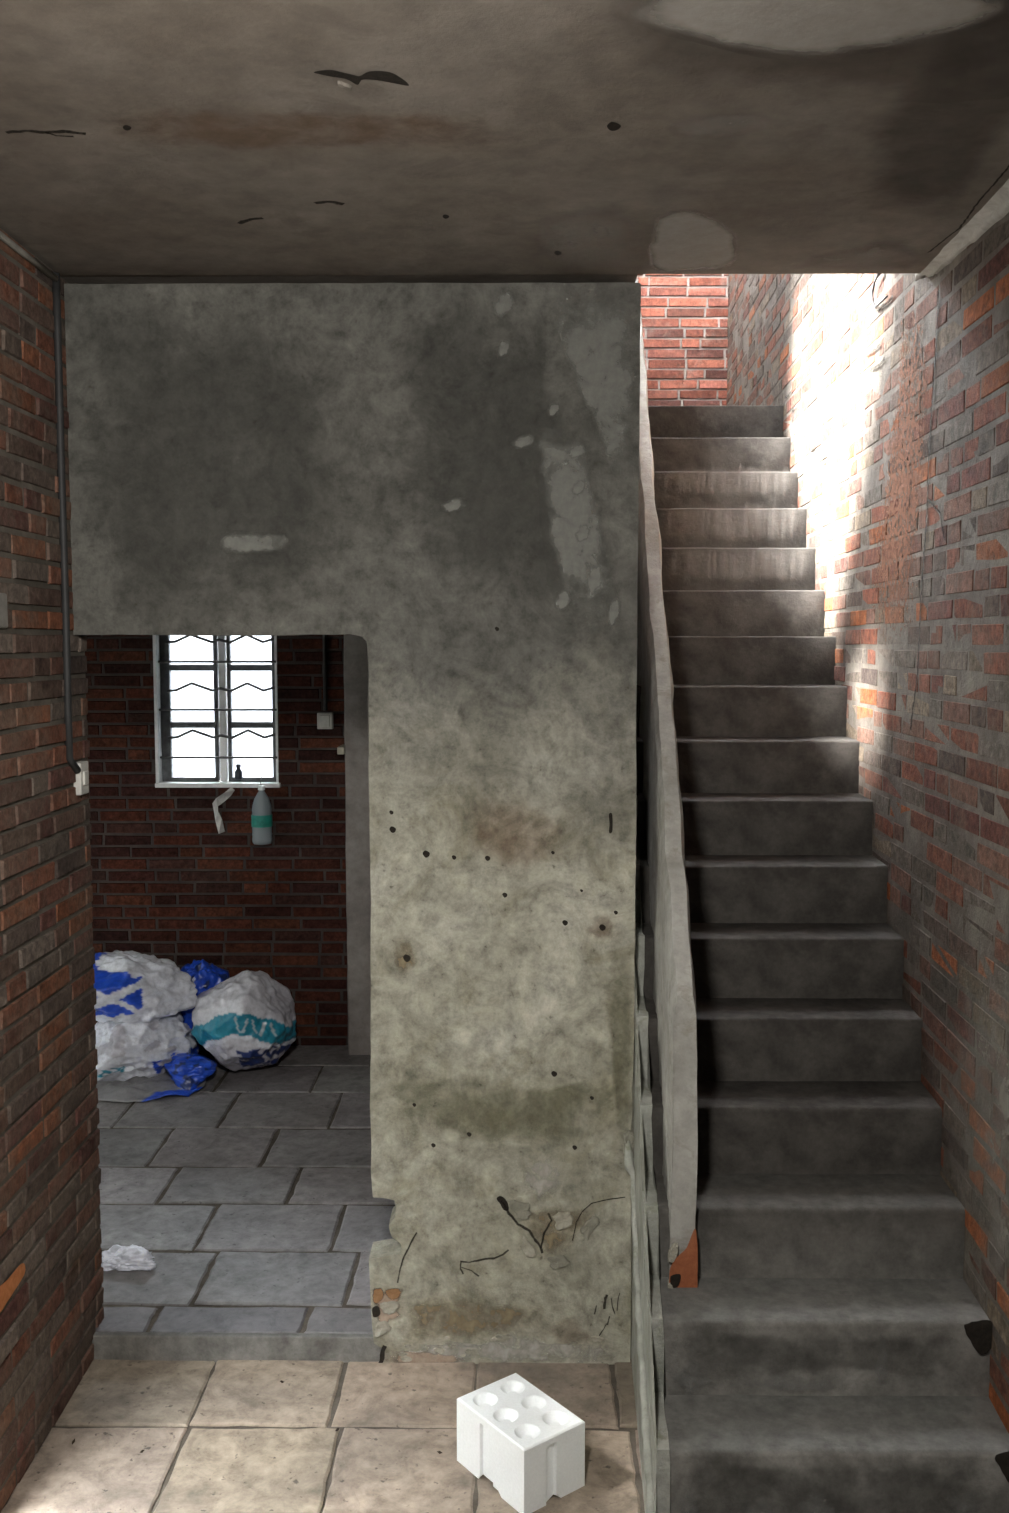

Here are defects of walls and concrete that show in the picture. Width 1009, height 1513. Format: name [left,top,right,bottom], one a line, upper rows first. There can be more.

crack [460,1250,509,1277]
spalling [372,1288,401,1338]